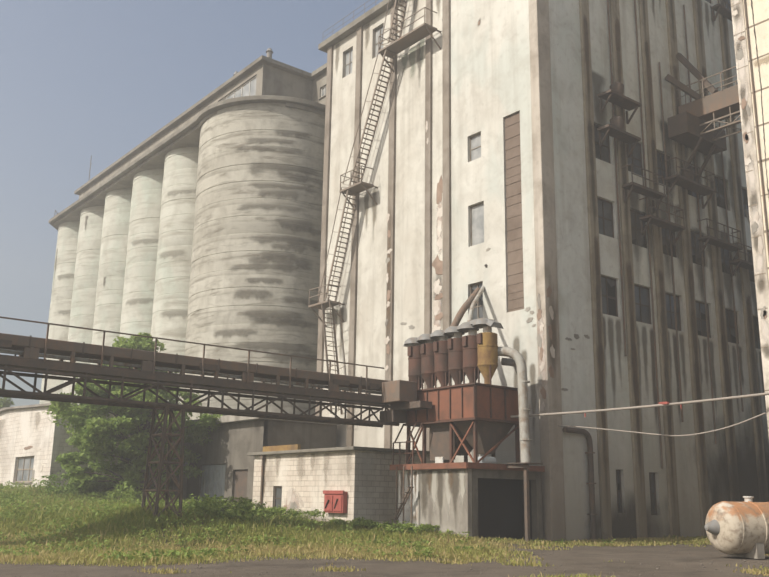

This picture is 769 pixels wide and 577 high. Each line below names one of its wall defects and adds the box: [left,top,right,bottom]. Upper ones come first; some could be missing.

water stain [239,130,306,152]
water stain [234,163,323,298]
flaking render [432,175,443,333]
water stain [721,233,757,308]
water stain [217,311,317,364]
flaking render [525,286,590,412]